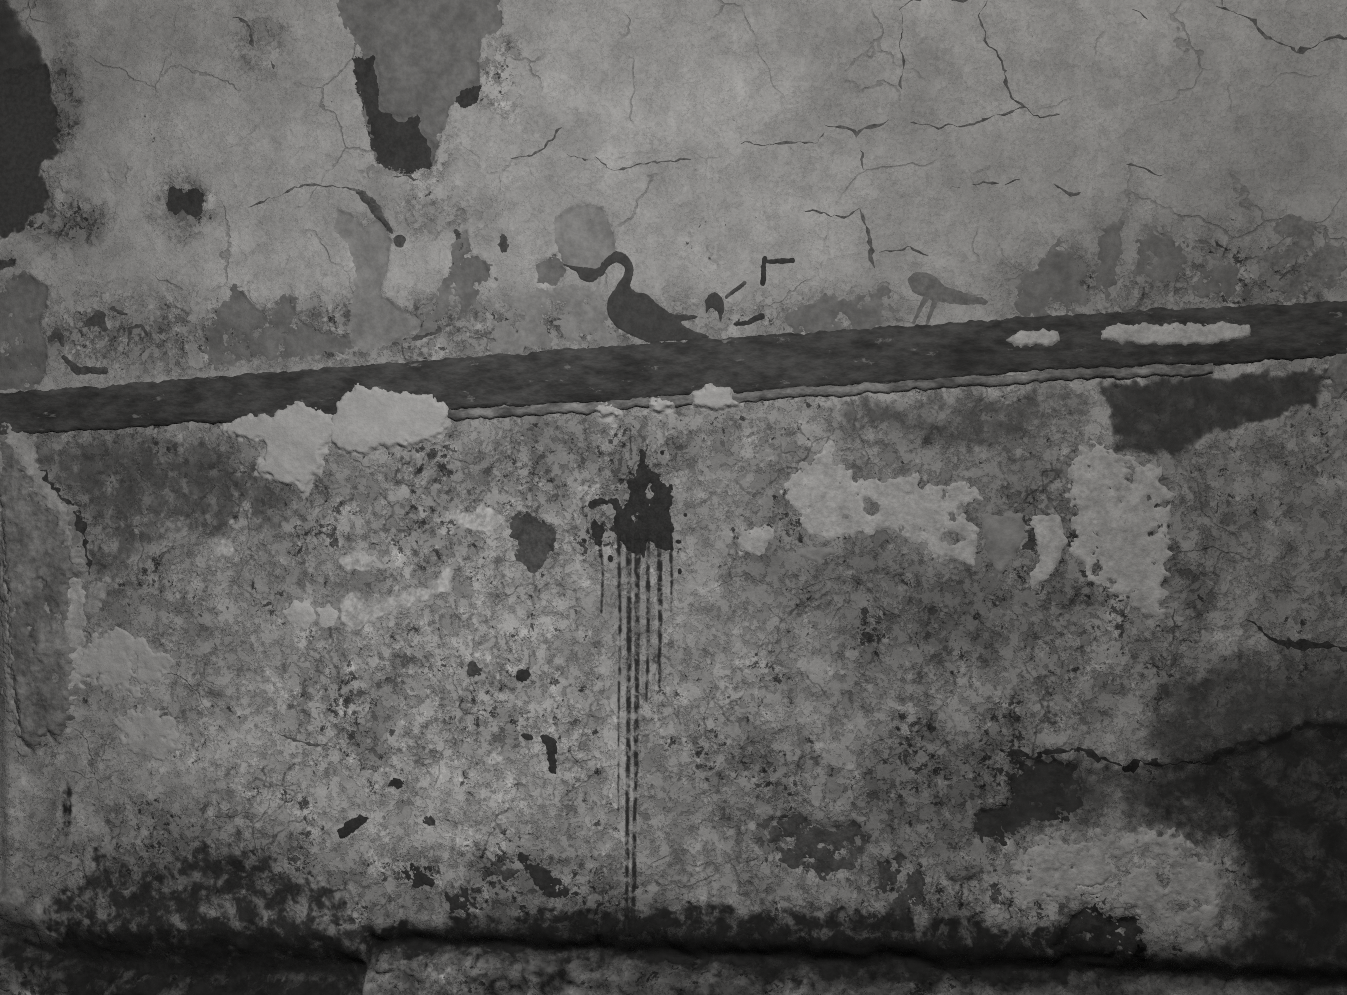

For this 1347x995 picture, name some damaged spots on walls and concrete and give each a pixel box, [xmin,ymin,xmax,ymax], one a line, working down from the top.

crack [234,17,275,68]
crack [1216,0,1347,54]
spalling [336,0,504,175]
crack [741,0,1060,168]
crack [510,127,691,170]
crack [250,174,418,209]
crack [1054,184,1081,197]
crack [805,208,928,268]
peeling [220,383,452,499]
crack [1245,619,1347,652]
crack [1007,722,1338,773]
leakage [0,667,1347,995]